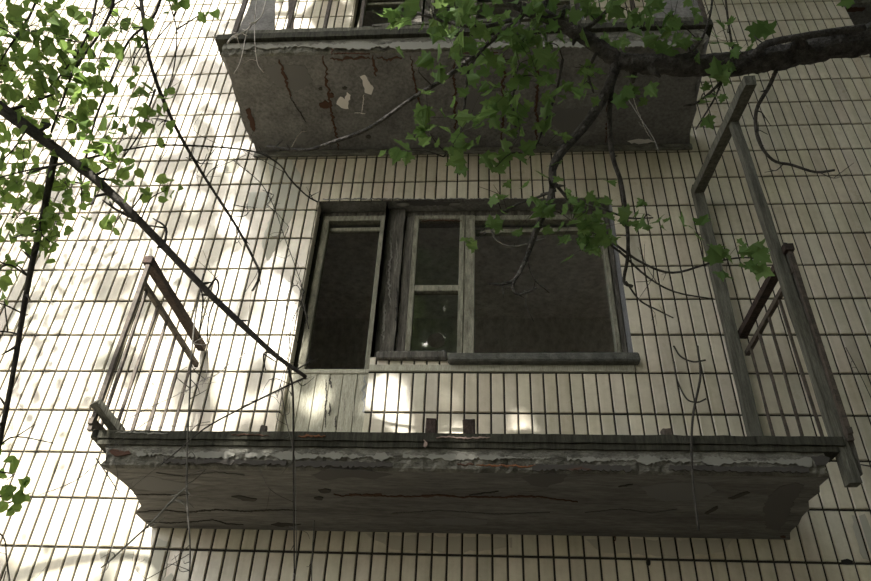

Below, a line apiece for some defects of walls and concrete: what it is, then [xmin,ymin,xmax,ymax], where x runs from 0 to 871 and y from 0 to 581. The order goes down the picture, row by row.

peeling [360,75,374,95]
peeling [336,86,351,109]
peeling [109,449,550,462]
crack [333,491,677,515]